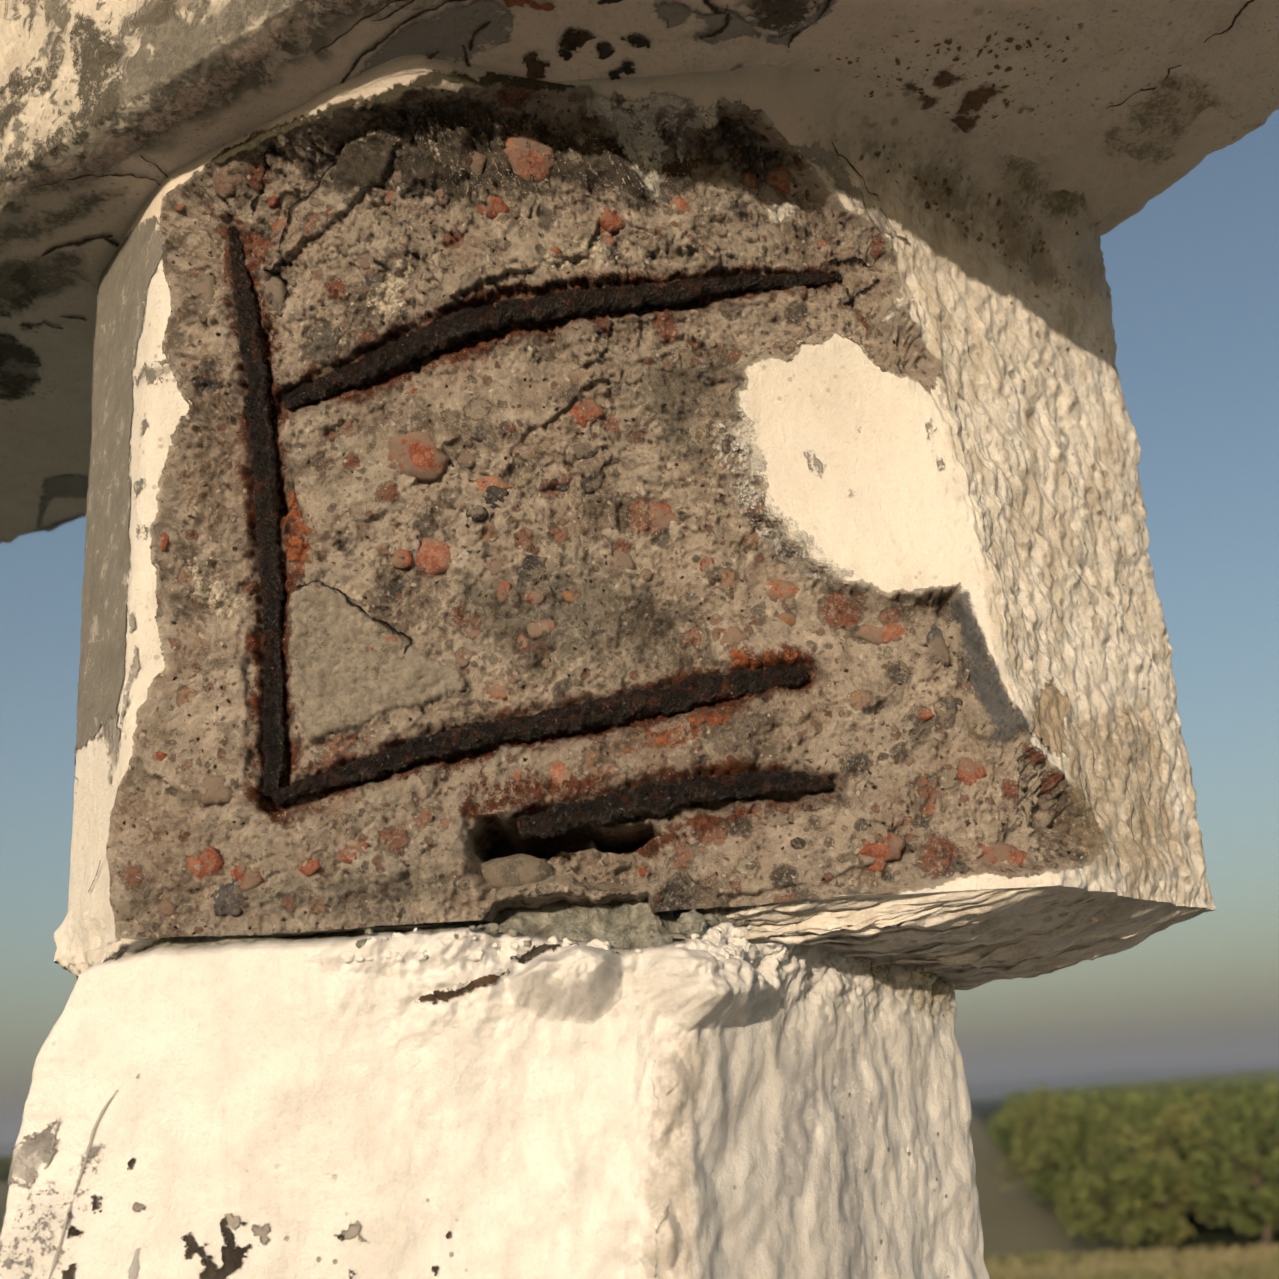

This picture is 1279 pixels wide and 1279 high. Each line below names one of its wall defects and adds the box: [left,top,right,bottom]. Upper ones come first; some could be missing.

damp [145,0,304,75]
peeling [654,0,836,46]
crack [1204,0,1254,43]
mould [0,13,122,181]
peeling [1,0,357,197]
crack [1106,65,1181,109]
crack [250,145,344,298]
spalling [35,27,1109,965]
rust [217,224,841,847]
crack [295,581,413,654]
rust [624,794,828,858]
spalling [181,1213,270,1279]